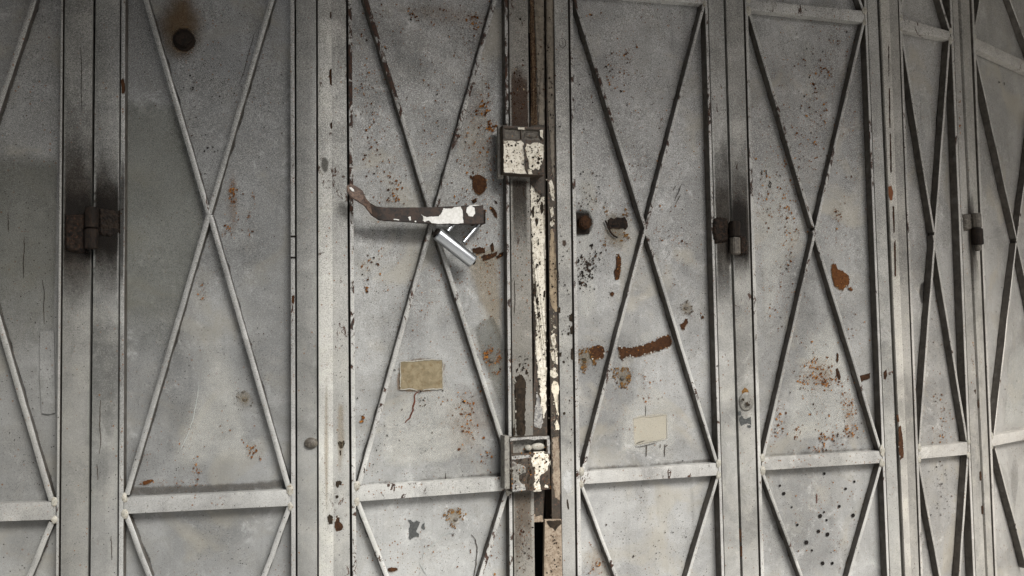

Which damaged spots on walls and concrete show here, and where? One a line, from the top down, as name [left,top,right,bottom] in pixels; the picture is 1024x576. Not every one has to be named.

rust [354,0,546,331]
peeling [512,0,574,509]
rust [575,13,700,296]
rust [757,20,861,329]
rust [411,384,500,475]
rust [560,318,675,443]
rust [770,257,870,453]
peeling [408,520,425,540]
rust [417,508,471,568]